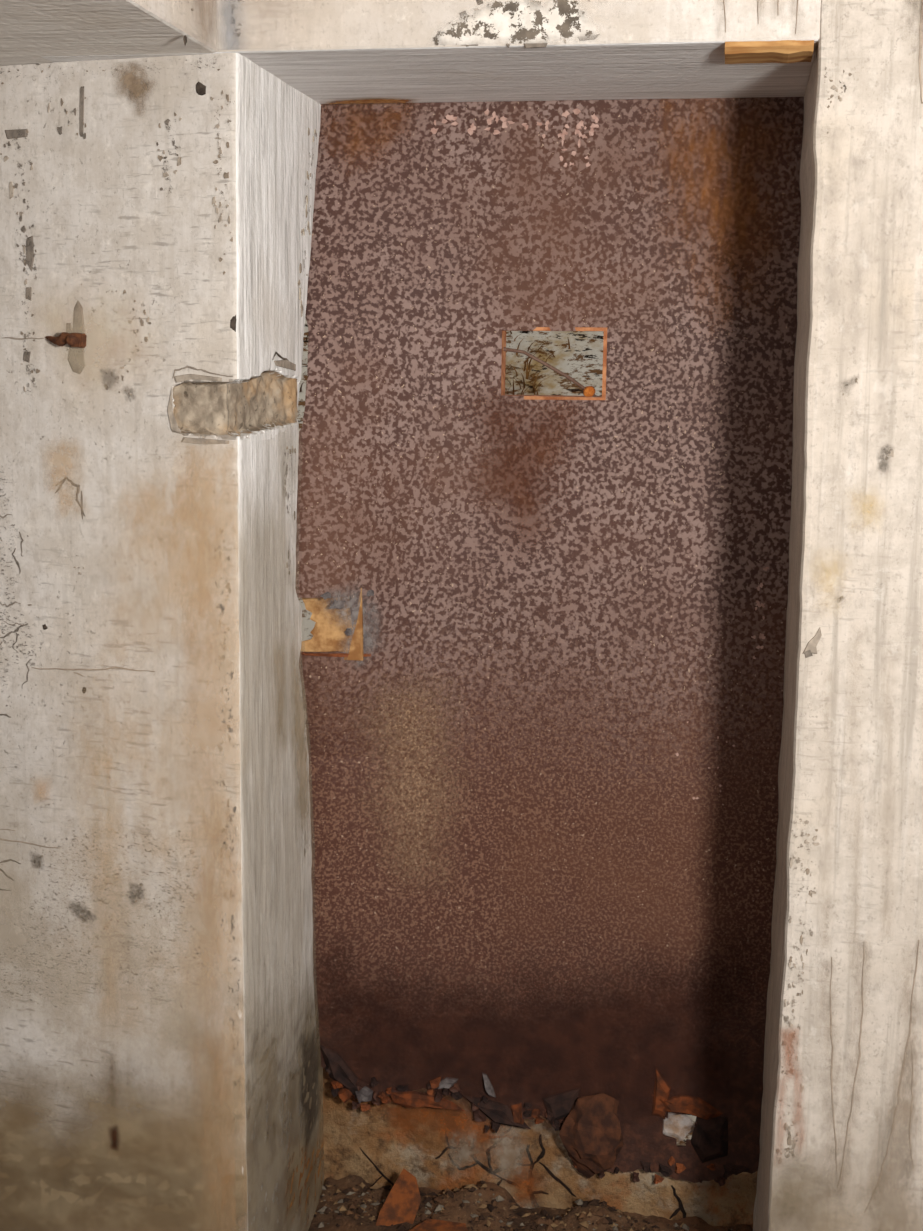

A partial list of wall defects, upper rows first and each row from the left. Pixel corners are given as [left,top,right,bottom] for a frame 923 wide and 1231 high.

spalling [433,0,600,49]
crack [55,476,85,519]
crack [0,514,24,572]
crack [0,601,155,689]
crack [0,829,60,891]
water stain [0,1000,324,1231]
corrosion [320,1045,686,1184]
corrosion [651,1070,750,1186]